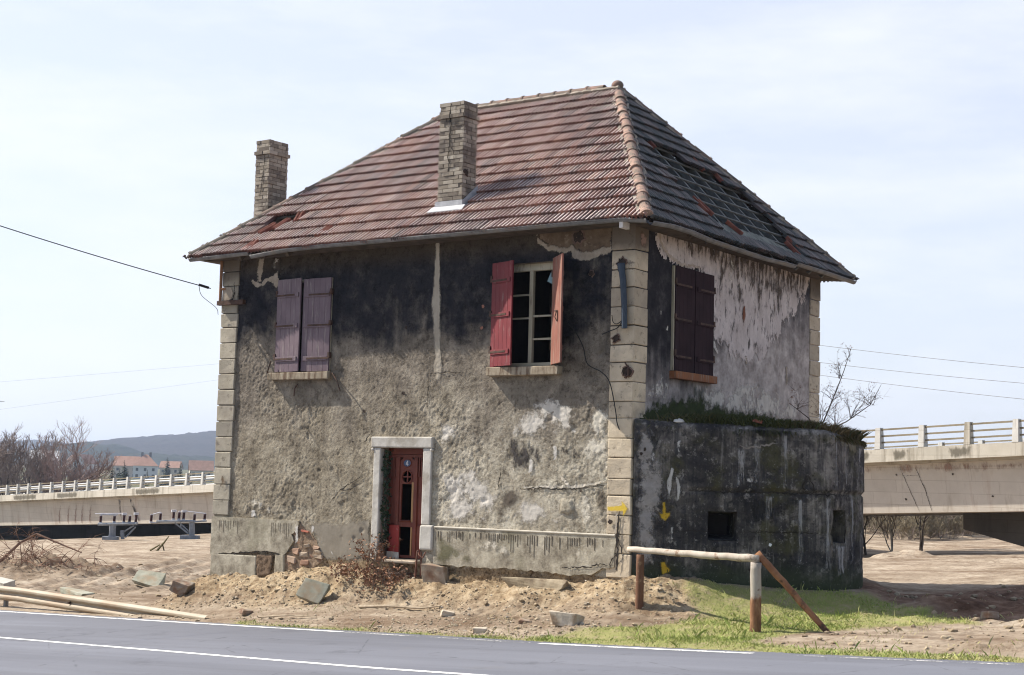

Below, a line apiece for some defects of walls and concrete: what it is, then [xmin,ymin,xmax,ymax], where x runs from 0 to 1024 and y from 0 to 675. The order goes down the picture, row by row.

flaking render [251,259,279,288]
water stain [431,243,442,380]
spalling [536,228,628,265]
flaking render [655,218,810,363]
water stain [513,399,576,436]
crack [498,472,607,492]
water stain [636,430,680,563]
water stain [738,445,759,484]
spalling [256,523,324,577]
water stain [826,499,854,574]